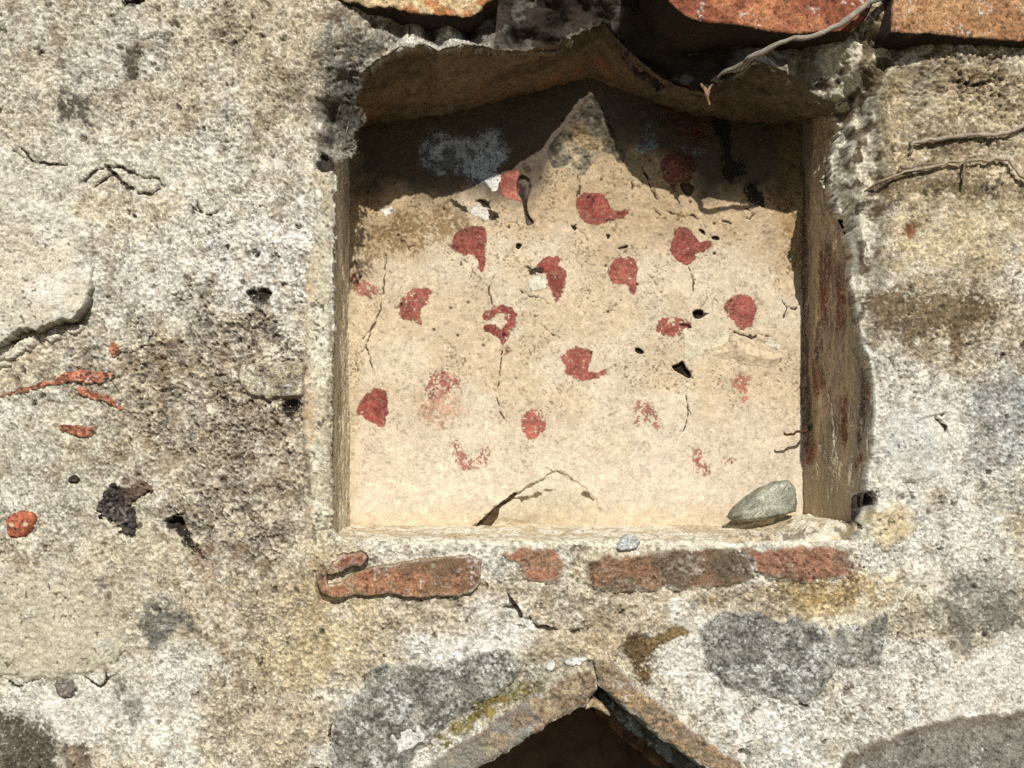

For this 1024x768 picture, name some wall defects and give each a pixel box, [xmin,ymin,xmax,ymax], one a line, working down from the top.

flaking render [547,96,626,175]
crack [12,148,165,196]
flaking render [450,172,501,221]
flaking render [517,162,534,225]
spalling [680,183,694,196]
crack [503,592,589,633]